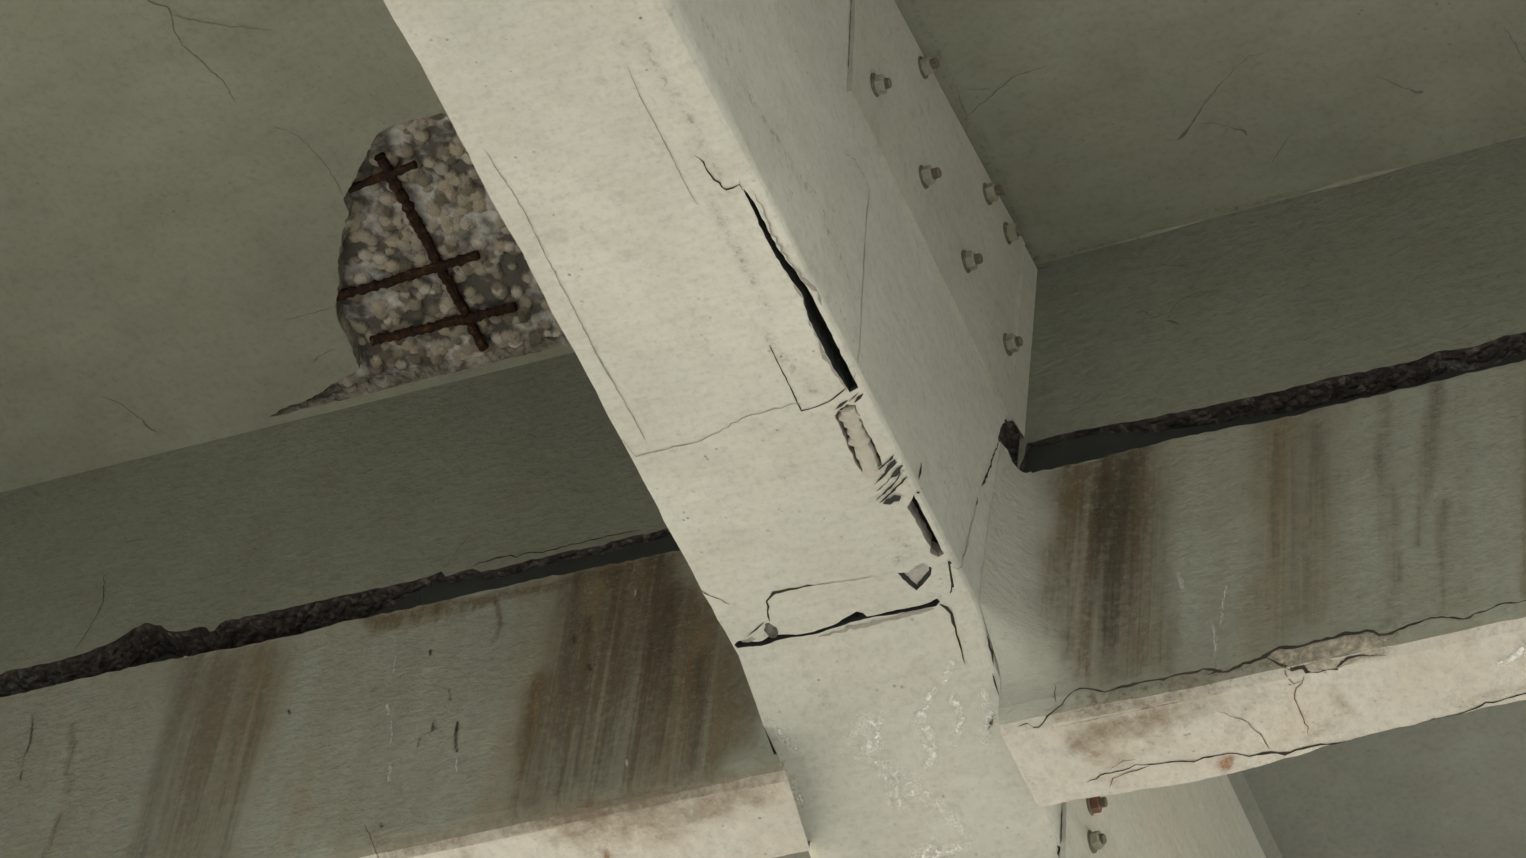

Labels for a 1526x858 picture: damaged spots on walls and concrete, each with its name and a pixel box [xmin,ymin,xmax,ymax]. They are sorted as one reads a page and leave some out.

crack [148,0,271,100]
spalling [270,113,570,417]
spalling [998,332,1526,473]
spalling [0,528,681,697]
crack [735,442,1526,788]
damp [852,661,965,858]